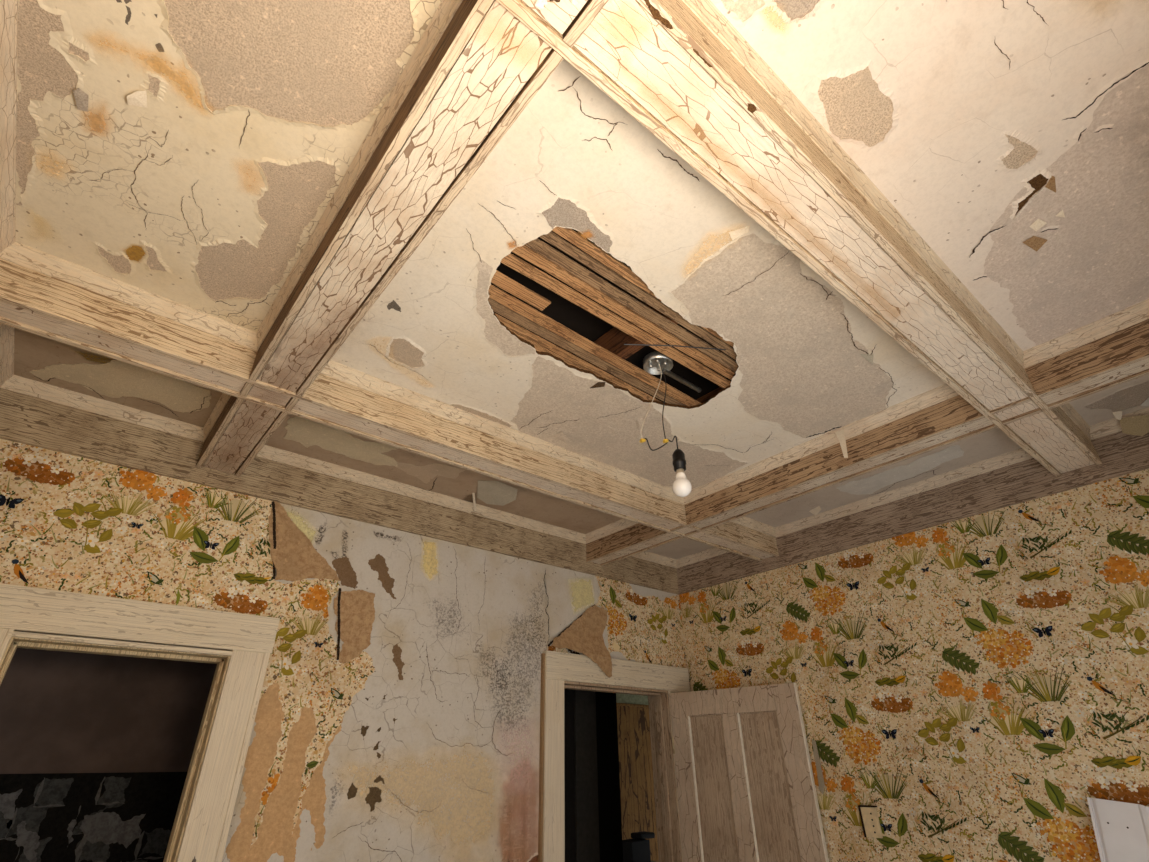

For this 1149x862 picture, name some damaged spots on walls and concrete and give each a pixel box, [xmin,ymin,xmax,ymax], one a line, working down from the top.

peeling [16,0,97,208]
peeling [116,0,132,25]
peeling [127,68,169,108]
peeling [154,0,421,131]
peeling [91,239,173,277]
crack [90,130,209,244]
peeling [190,155,341,303]
peeling [984,64,1149,346]
peeling [450,255,750,490]
peeling [667,225,896,458]
crack [426,645,513,756]